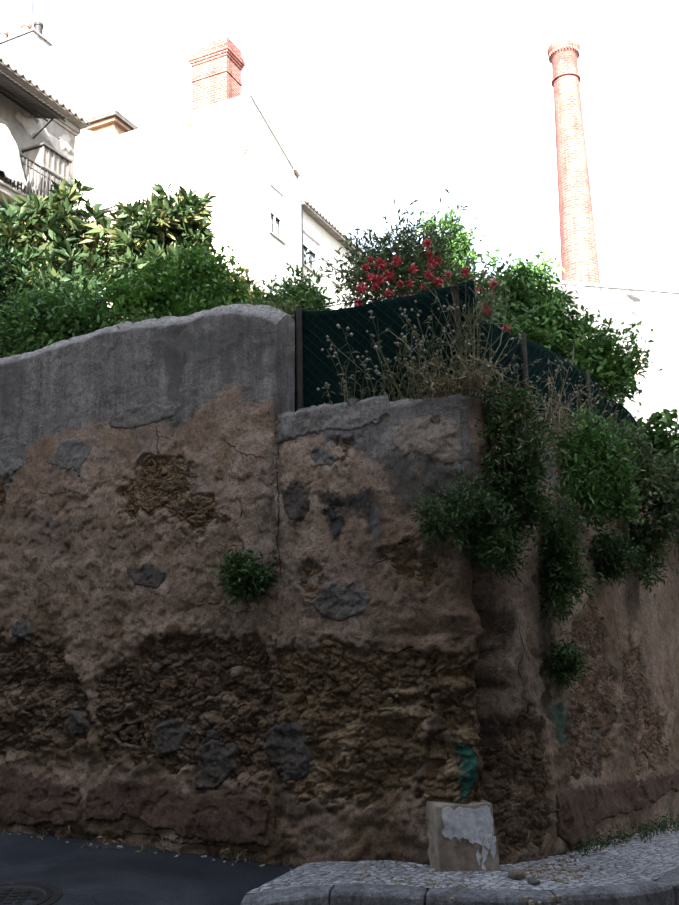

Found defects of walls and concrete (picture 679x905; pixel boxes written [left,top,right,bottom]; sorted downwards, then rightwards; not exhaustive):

flaking render [15,112,72,184]
flaking render [119,454,225,534]
flaking render [0,592,679,855]